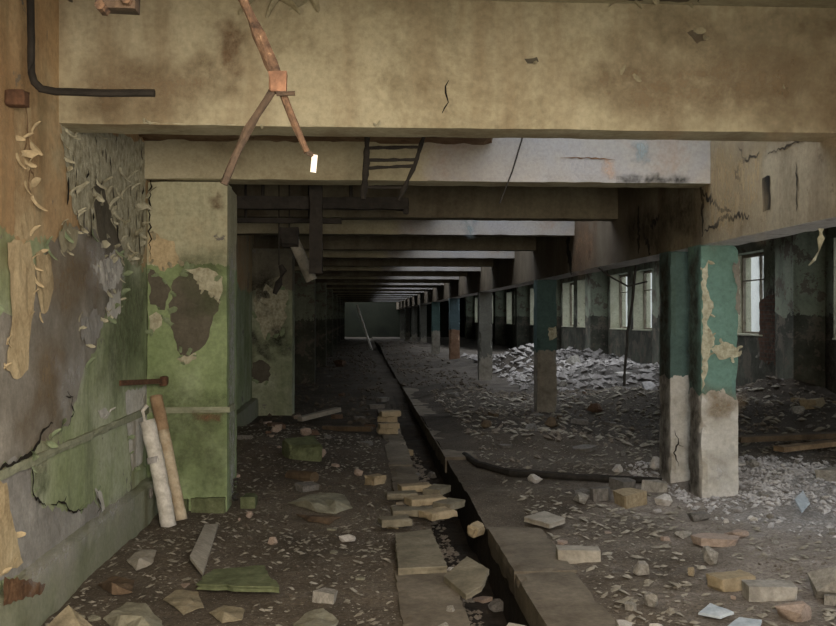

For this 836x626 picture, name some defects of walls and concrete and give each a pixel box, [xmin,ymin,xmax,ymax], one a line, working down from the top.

peeling [0,108,223,606]